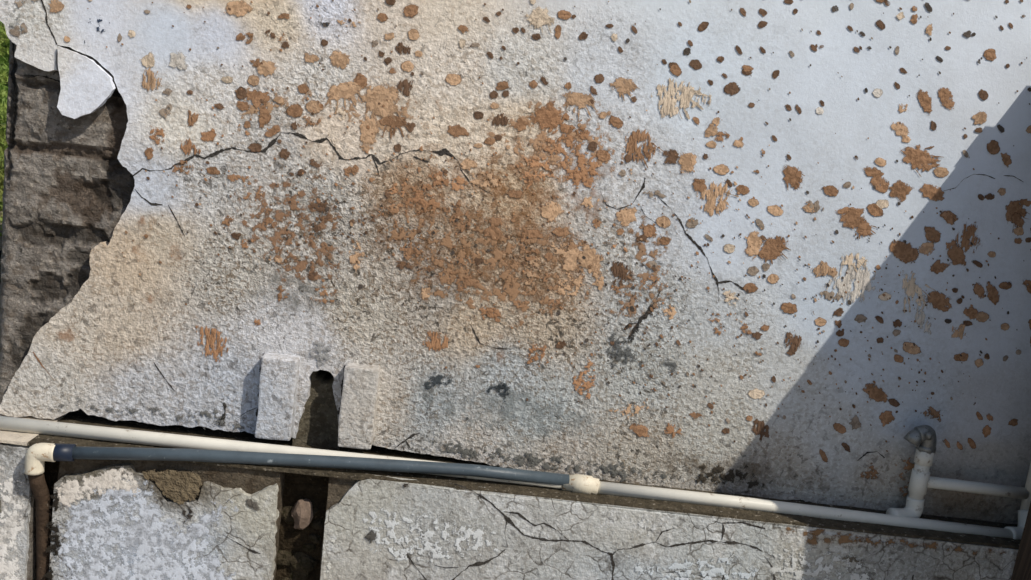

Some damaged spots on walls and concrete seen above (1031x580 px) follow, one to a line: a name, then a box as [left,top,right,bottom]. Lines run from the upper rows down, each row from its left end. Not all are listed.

crack [41,0,57,44]
spalling [0,40,135,404]
corrosion [228,172,343,302]
crack [132,132,493,237]
corrosion [325,86,397,135]
corrosion [374,180,586,326]
corrosion [487,101,624,201]
crack [602,178,744,291]
crack [624,291,661,339]
leakage [42,486,61,580]
crack [399,483,776,580]